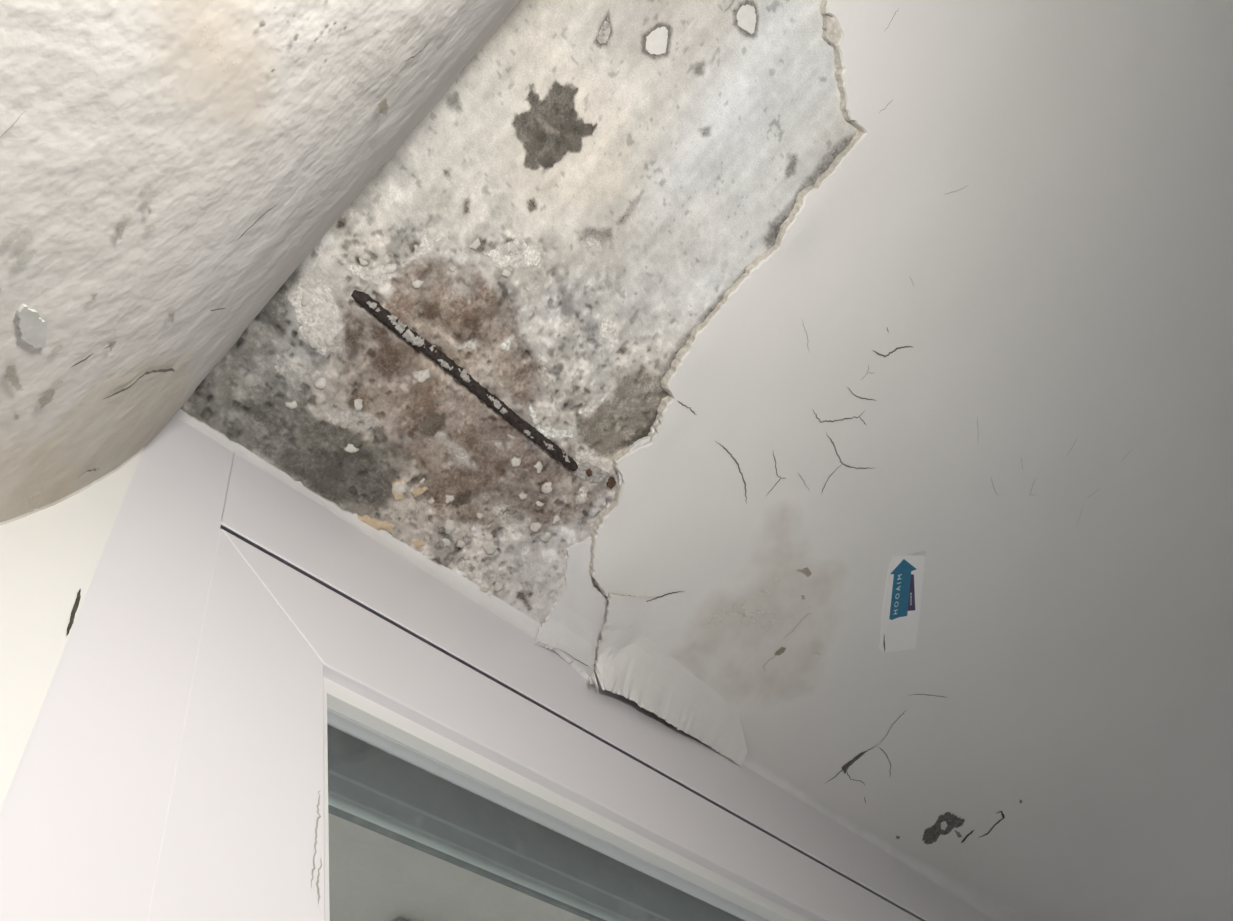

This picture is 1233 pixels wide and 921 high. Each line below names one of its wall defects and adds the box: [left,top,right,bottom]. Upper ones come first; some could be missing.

peeling [6,366,21,390]
peeling [16,304,61,353]
damp [238,350,392,503]
damp [288,230,445,355]
corrosion [389,266,506,339]
corrosion [395,381,592,528]
damp [487,238,540,268]
spalling [180,0,858,625]
crack [716,328,912,504]
crack [826,694,949,803]
peeling [922,812,965,844]